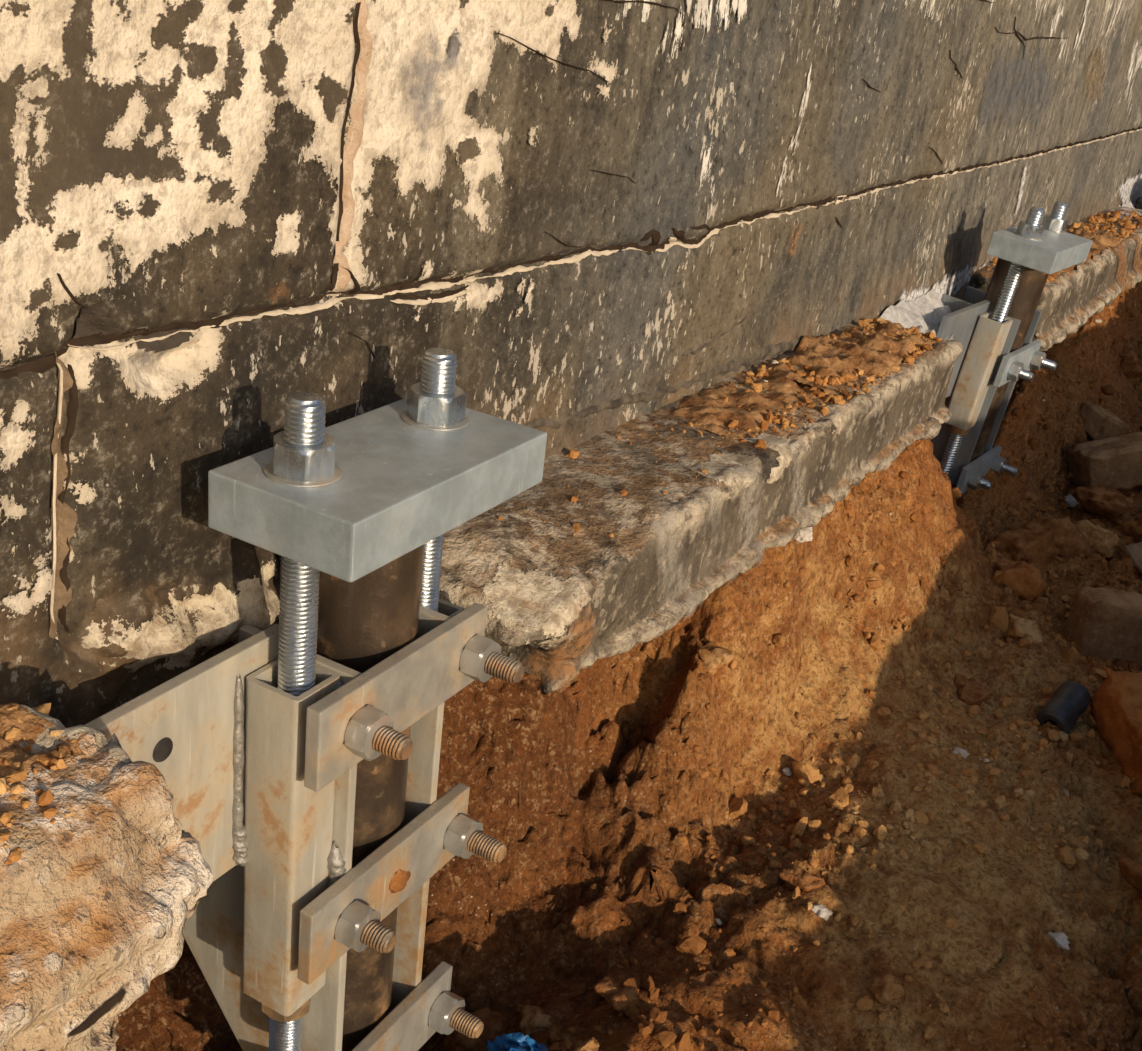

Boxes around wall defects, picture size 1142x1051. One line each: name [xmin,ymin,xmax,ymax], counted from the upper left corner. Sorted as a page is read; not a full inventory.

peeling [582,0,656,104]
peeling [661,0,747,62]
peeling [1033,0,1091,62]
peeling [1124,39,1142,115]
peeling [698,135,715,223]
peeling [776,67,812,206]
peeling [0,0,583,473]
crack [0,0,1142,504]
peeling [0,449,97,640]
crack [58,537,70,633]